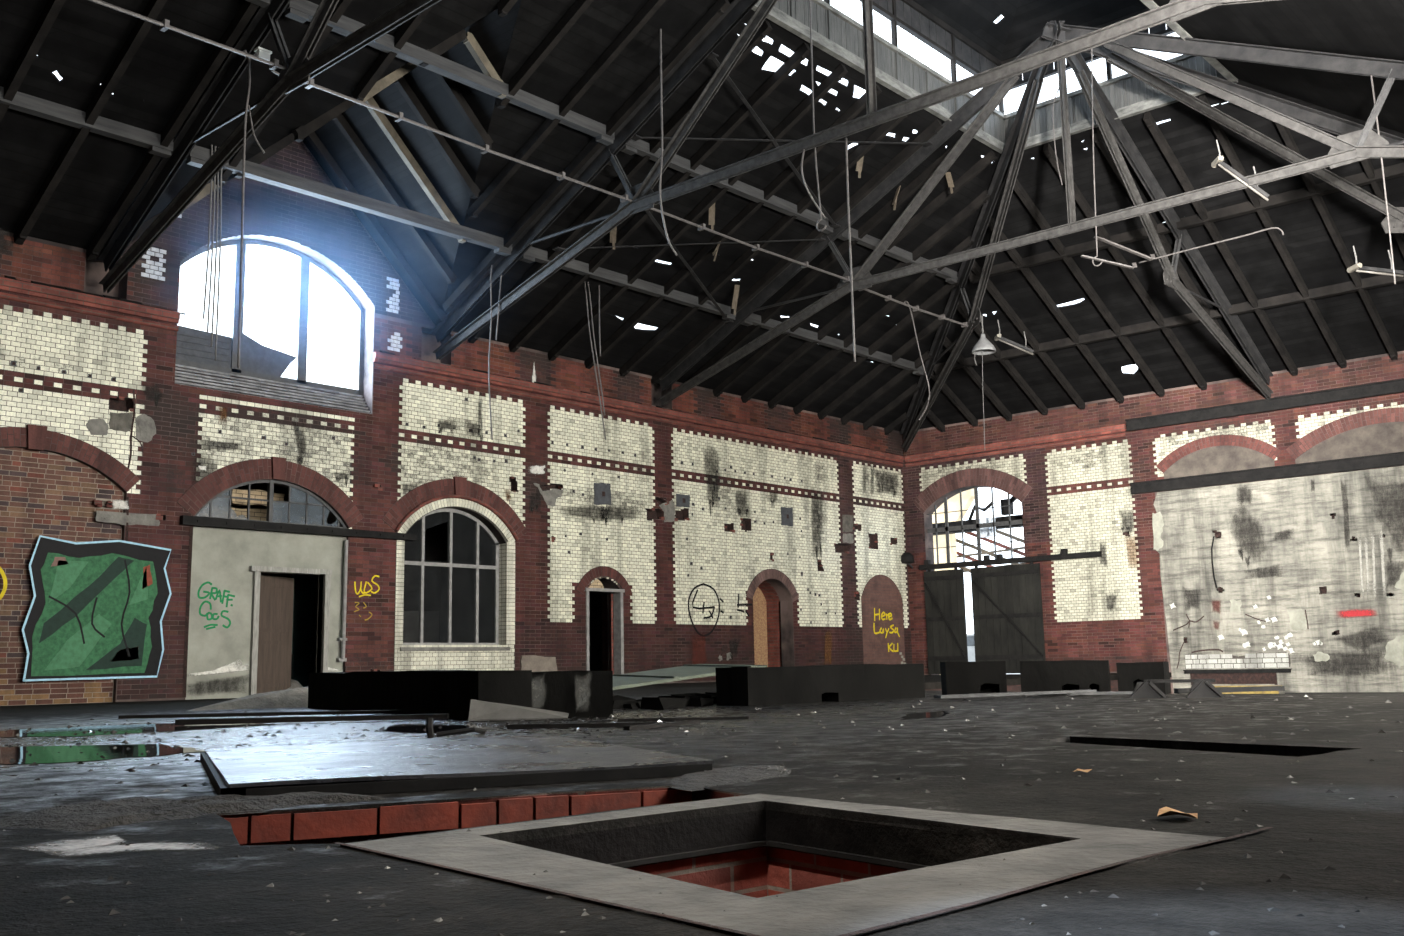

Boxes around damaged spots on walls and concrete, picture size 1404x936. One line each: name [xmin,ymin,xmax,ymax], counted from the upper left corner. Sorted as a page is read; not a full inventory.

water stain [1359,535,1392,593]
flaking render [1389,571,1404,597]
flaking render [1384,635,1404,668]